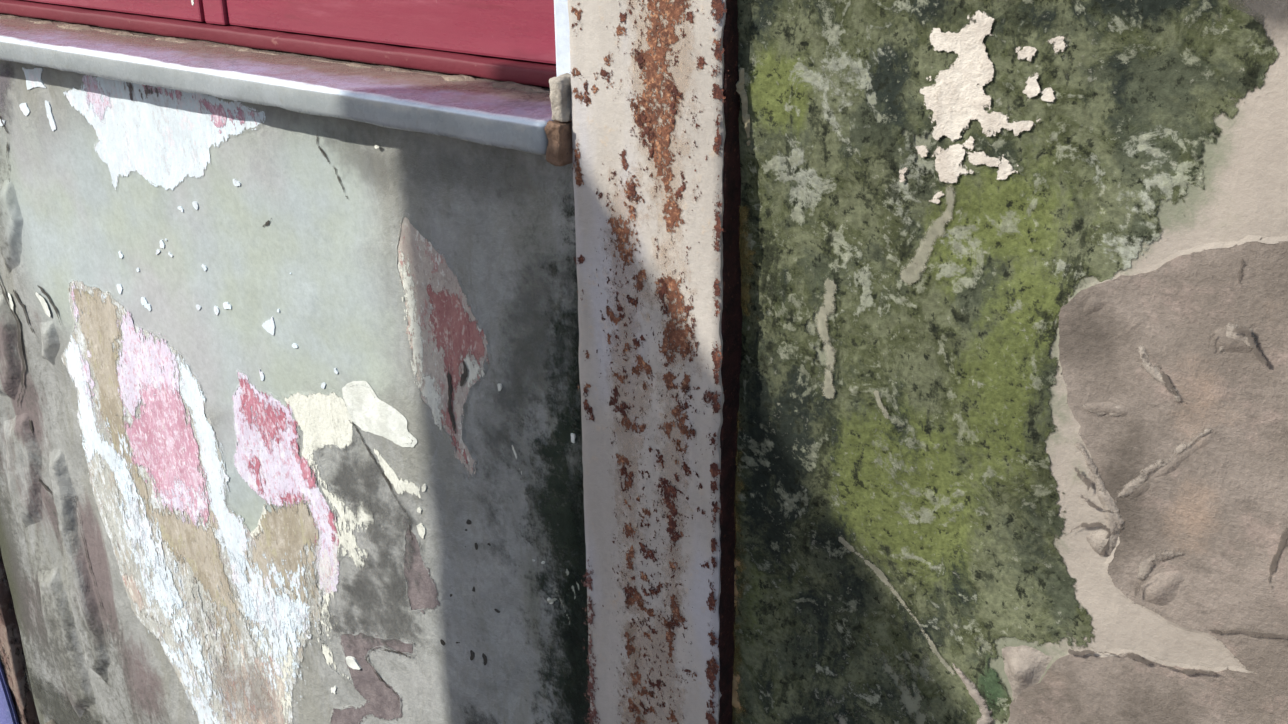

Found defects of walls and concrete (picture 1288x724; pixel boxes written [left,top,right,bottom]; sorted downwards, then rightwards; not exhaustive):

peeling [19,67,268,193]
flaking render [916,10,1041,204]
flaking render [1016,36,1067,102]
damp [901,187,954,284]
crack [0,283,61,436]
peeling [60,279,452,724]
peeling [395,210,502,480]
corrosion [569,0,753,724]
damp [816,279,836,399]
damp [874,390,889,418]
peeling [1002,235,1288,724]
damp [838,537,955,675]